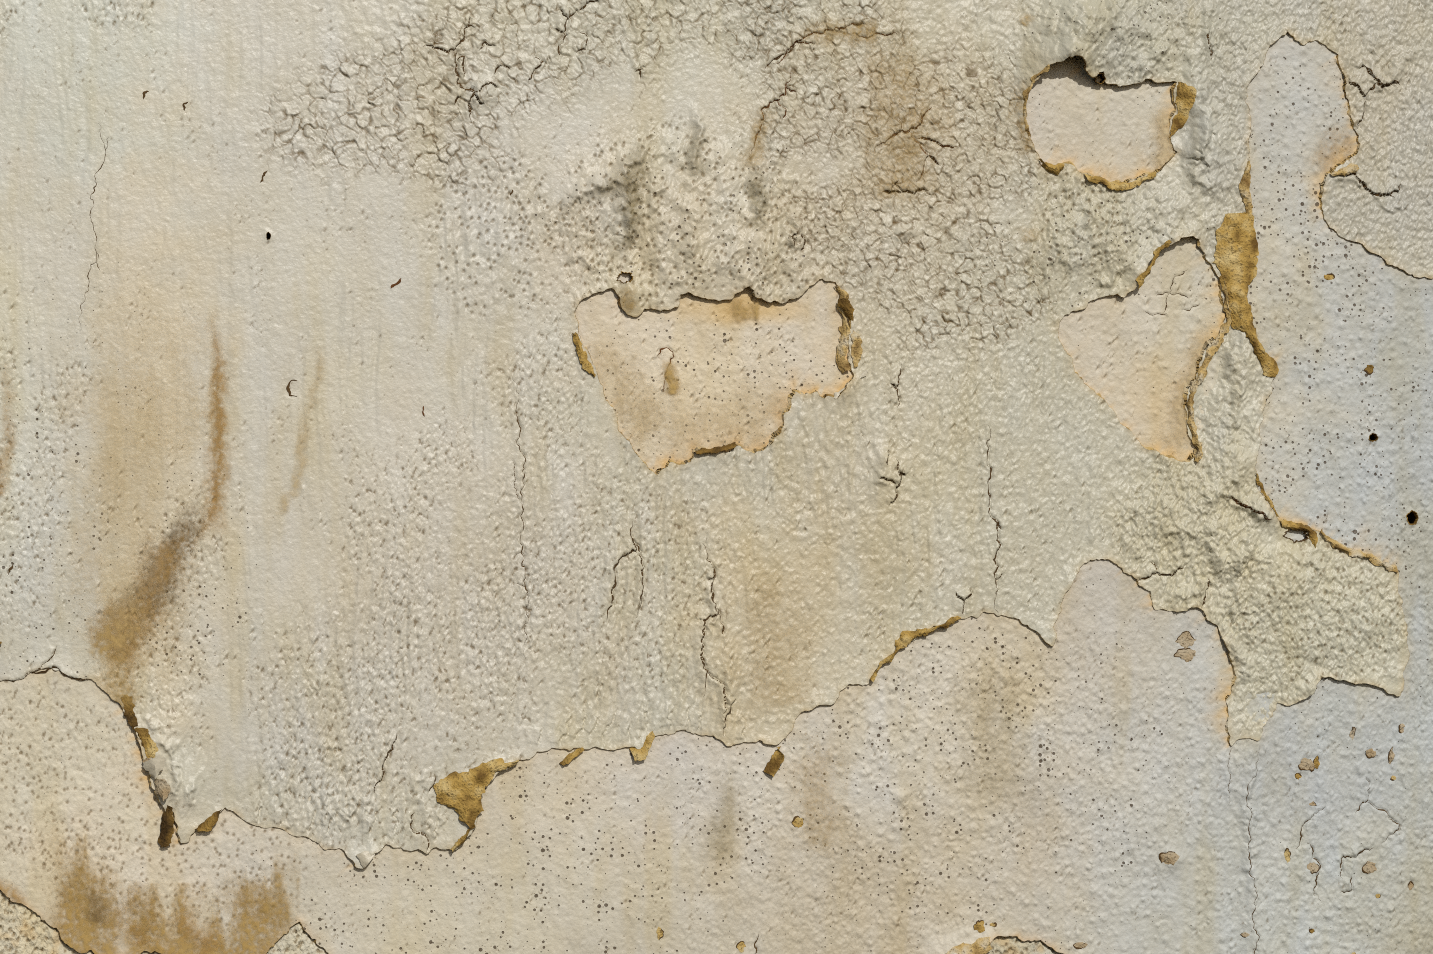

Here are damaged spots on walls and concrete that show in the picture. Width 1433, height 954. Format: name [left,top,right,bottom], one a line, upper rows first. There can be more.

peeling [1022,55,1197,191]
crack [260,0,1045,343]
peeling [572,272,869,475]
peeling [1058,236,1232,463]
crack [0,649,91,682]
crack [700,546,733,735]
crack [374,735,397,793]
crack [410,778,436,852]
spalling [0,890,94,954]
water stain [58,866,289,954]
spalling [254,922,329,954]
spalling [946,936,1064,954]